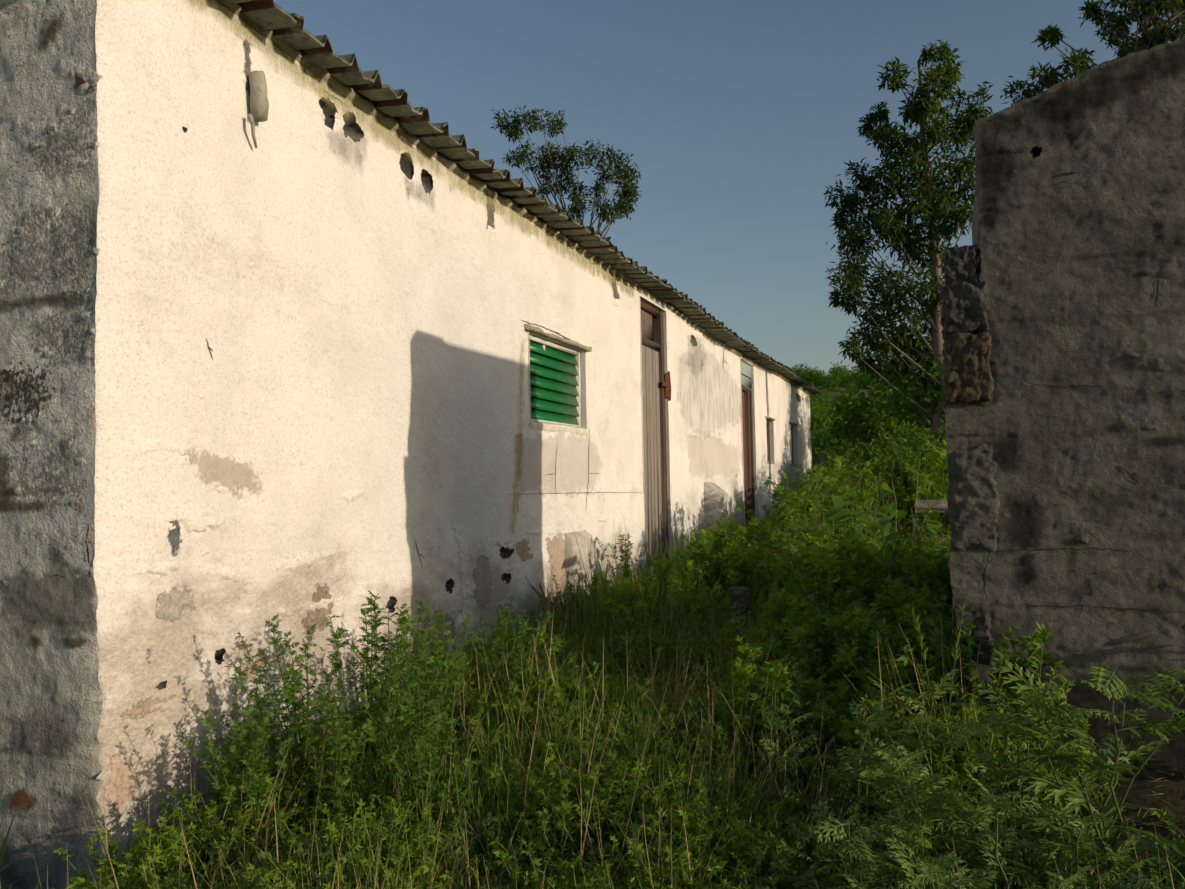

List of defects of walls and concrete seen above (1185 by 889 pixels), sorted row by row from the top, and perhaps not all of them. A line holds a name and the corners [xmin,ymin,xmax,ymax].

leakage [40,15,63,50]
leakage [0,294,87,312]
spalling [157,515,182,562]
leakage [1012,498,1041,584]
crack [982,547,1131,600]
spalling [151,585,196,622]
spalling [302,579,335,639]
spalling [385,596,399,613]
spalling [213,641,231,665]
spalling [242,649,277,679]
spalling [110,681,182,726]
spalling [96,740,137,822]